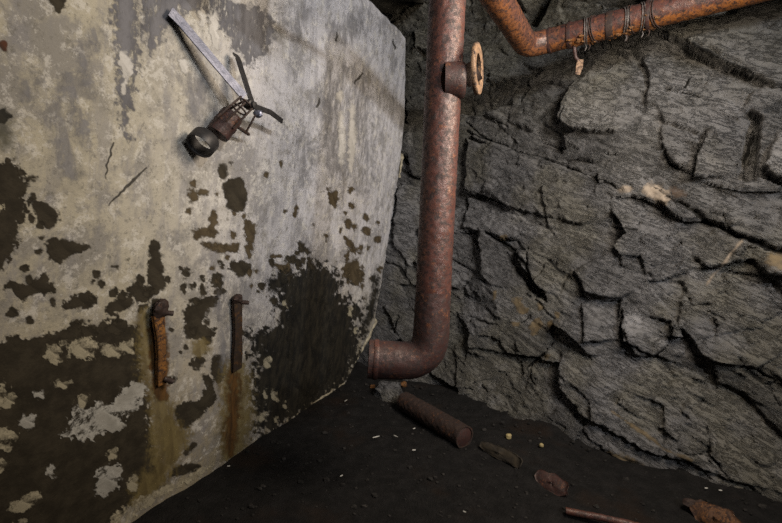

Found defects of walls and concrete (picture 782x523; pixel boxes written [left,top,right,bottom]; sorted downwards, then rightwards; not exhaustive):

spalling [50,0,66,13]
crack [668,40,782,98]
crack [466,121,623,190]
peeling [0,157,91,270]
peeling [0,239,214,523]
rust [129,310,193,507]
spalling [174,162,259,429]
rust [219,332,254,461]
damp [242,240,383,440]
spalling [326,172,381,286]
crack [465,232,569,297]
crack [659,190,782,254]